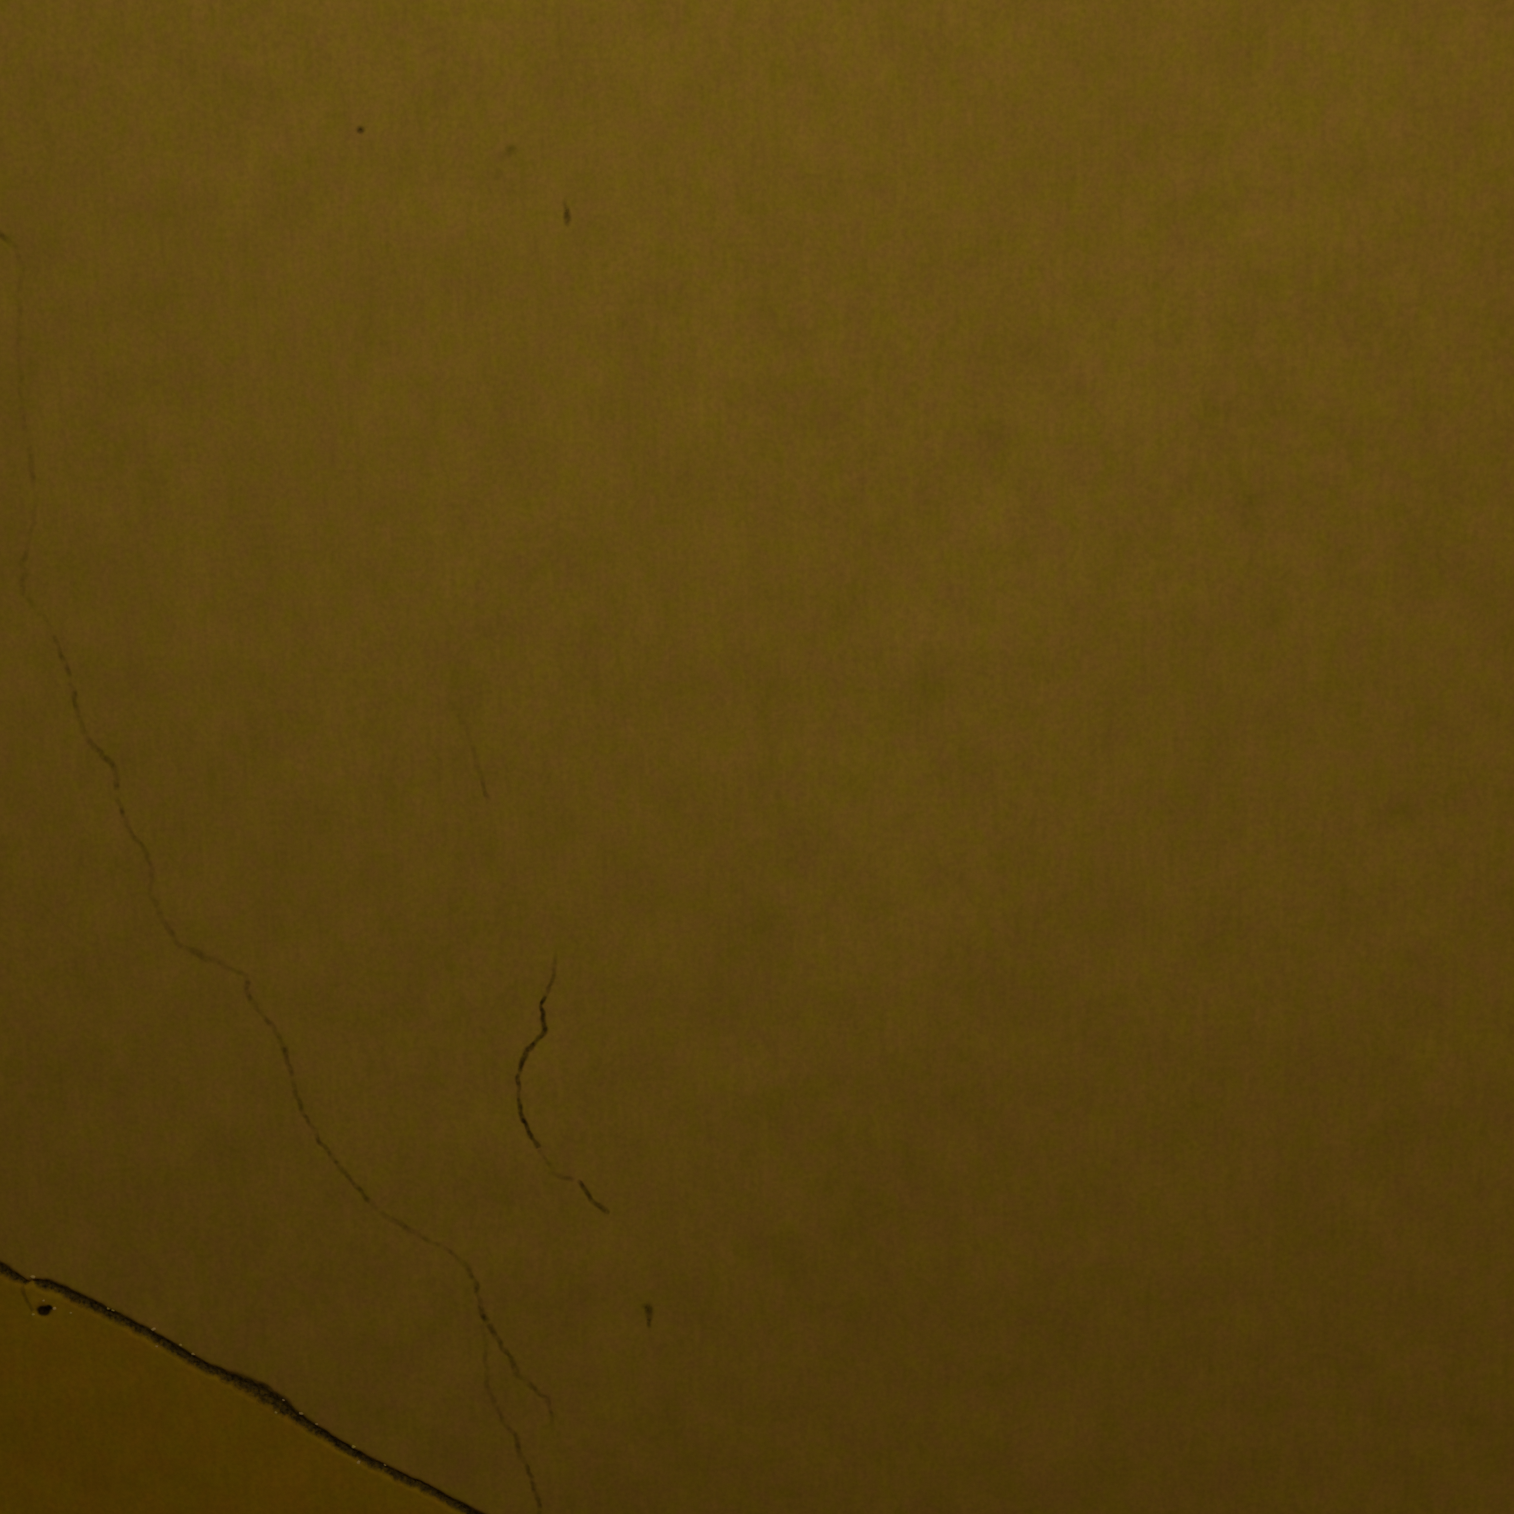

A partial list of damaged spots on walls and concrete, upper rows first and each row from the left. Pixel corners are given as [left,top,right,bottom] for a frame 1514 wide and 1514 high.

crack [517,999,547,1138]
crack [0,1263,480,1514]